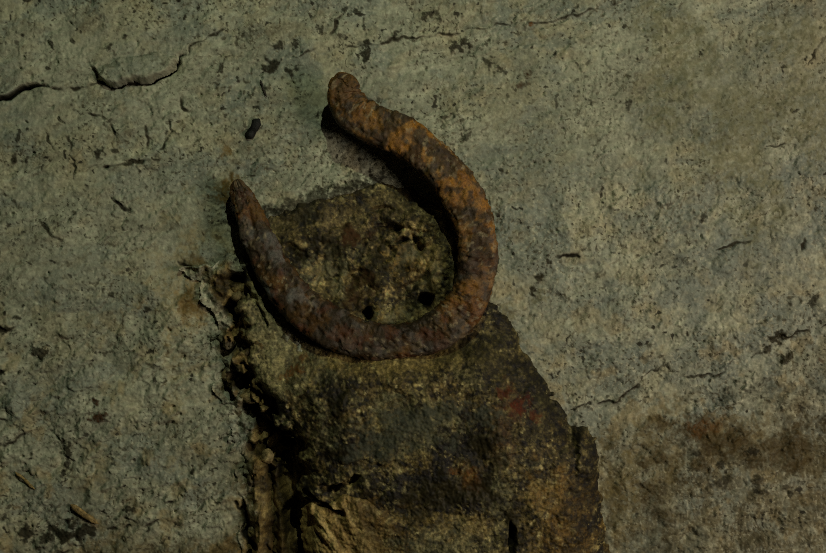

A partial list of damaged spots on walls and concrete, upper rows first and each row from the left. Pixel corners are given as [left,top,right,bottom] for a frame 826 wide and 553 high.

crack [0,29,224,101]
spalling [530,254,552,296]
spalling [178,253,410,553]
crack [571,361,732,410]